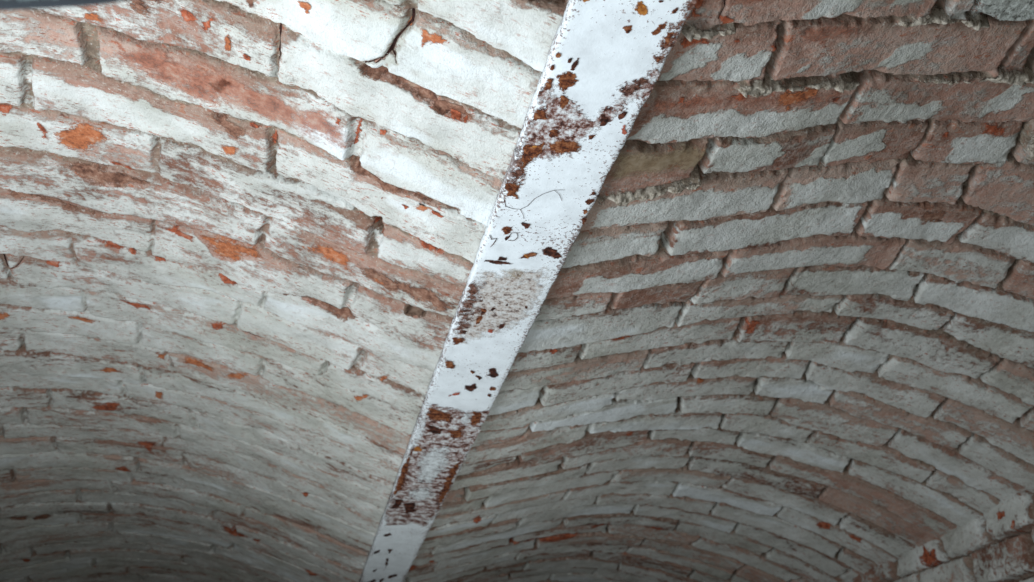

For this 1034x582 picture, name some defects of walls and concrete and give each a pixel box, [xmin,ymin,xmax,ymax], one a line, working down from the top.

peeling [686,0,734,25]
crack [363,8,415,63]
peeling [681,37,710,48]
peeling [520,67,841,166]
peeling [982,122,1006,137]
peeling [37,123,150,188]
spalling [918,201,946,223]
spalling [161,225,259,261]
peeling [385,404,490,527]
spalling [919,546,946,567]